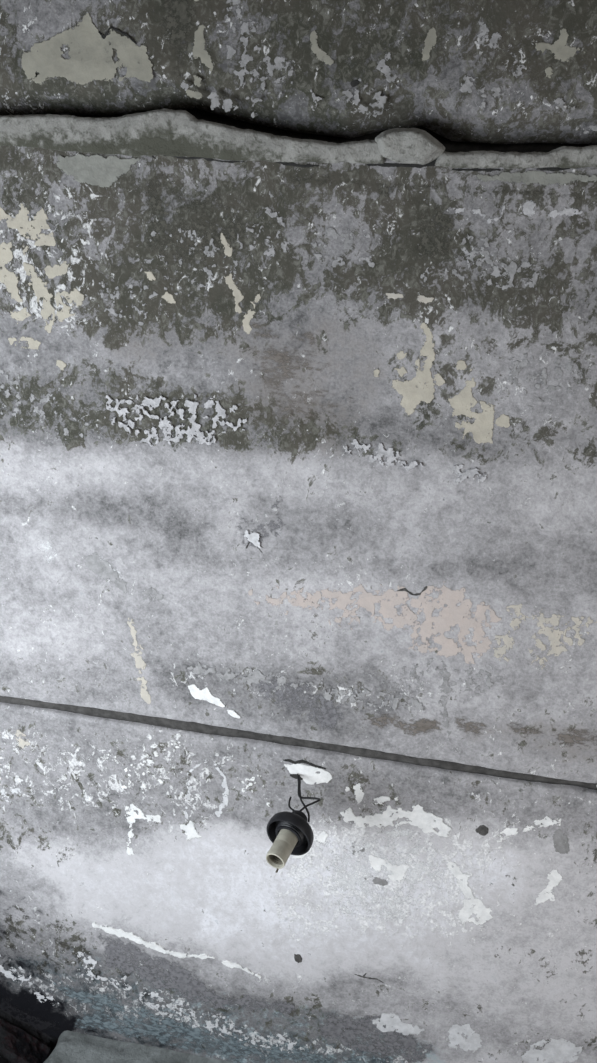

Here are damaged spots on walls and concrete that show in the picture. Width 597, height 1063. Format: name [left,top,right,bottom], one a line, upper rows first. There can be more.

peeling [21,13,154,85]
crack [44,112,126,120]
crack [152,155,244,163]
crack [185,109,592,172]
water stain [146,174,244,267]
water stain [418,184,505,258]
water stain [504,189,583,218]
peeling [0,203,84,350]
peeling [97,191,292,334]
peeling [0,369,247,449]
peeling [340,783,451,837]
water stain [99,935,295,1014]